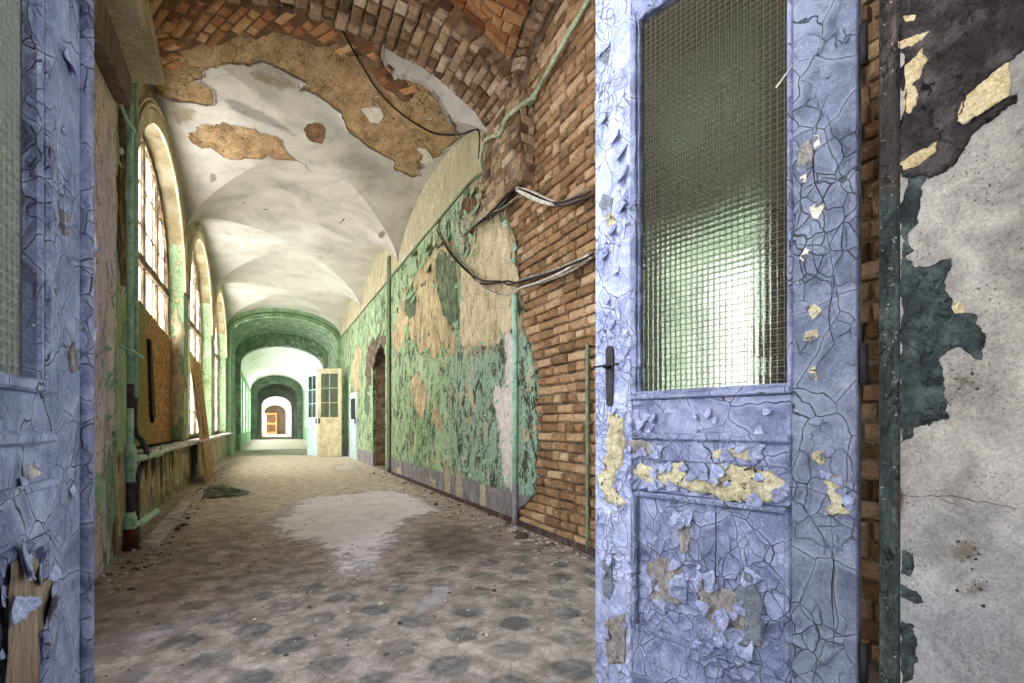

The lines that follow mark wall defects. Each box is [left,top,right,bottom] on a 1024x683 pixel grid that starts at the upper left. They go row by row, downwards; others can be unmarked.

spalling [149,0,462,178]
flaking render [351,0,628,600]
crack [810,94,835,374]
flaking render [807,0,879,662]
peeling [893,0,1024,443]
peeling [0,539,64,683]
peeling [639,507,768,662]
peeling [626,407,791,511]
crack [825,541,835,657]
peeling [899,622,918,683]
peeling [900,550,924,604]
crack [904,495,1018,509]